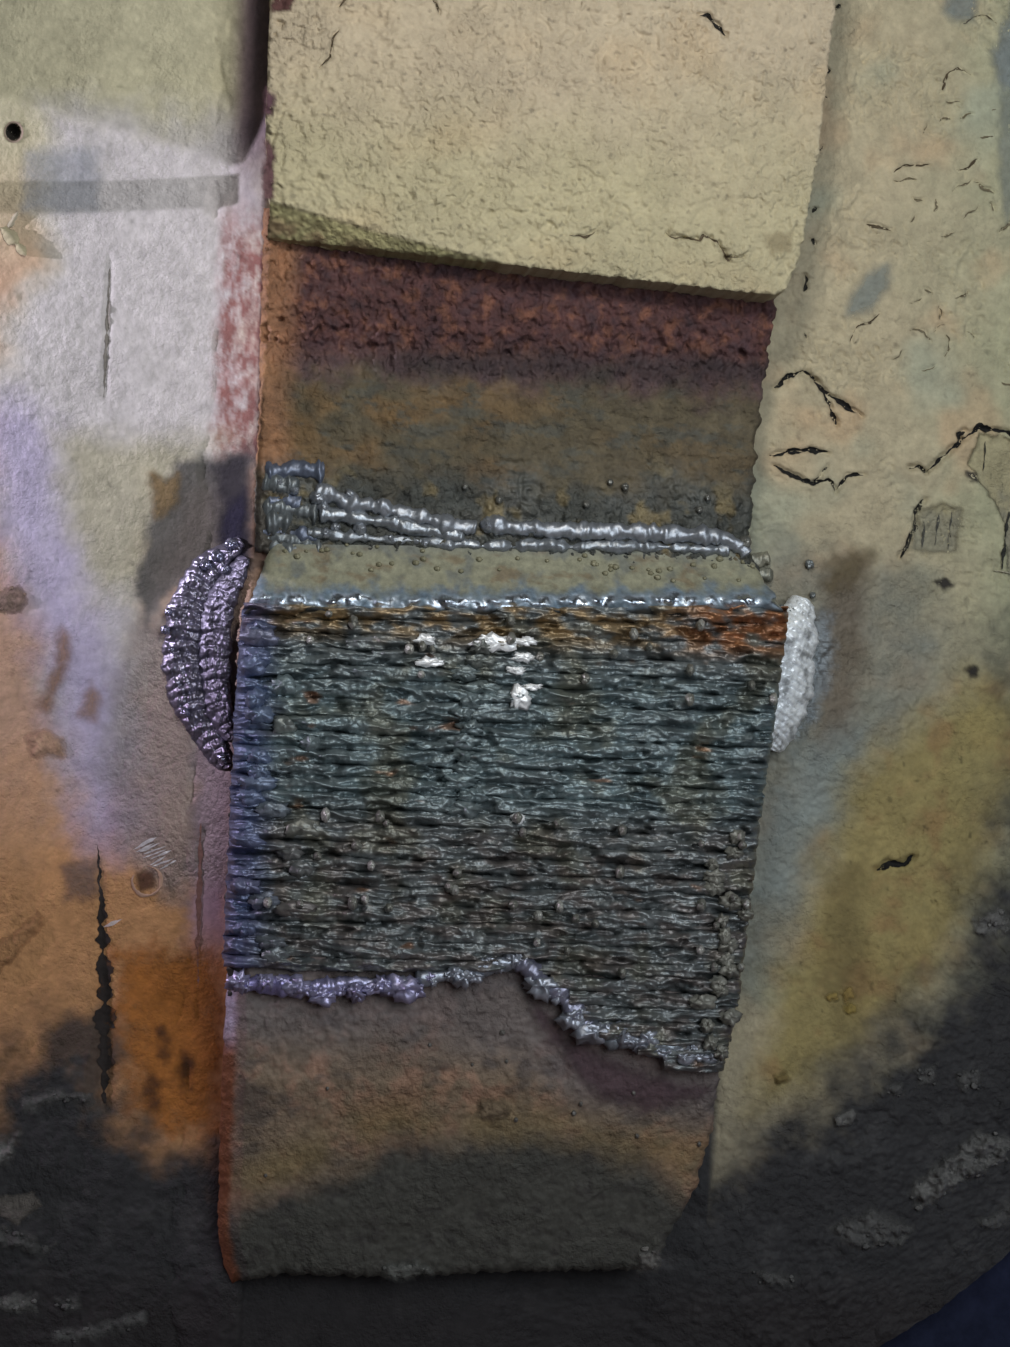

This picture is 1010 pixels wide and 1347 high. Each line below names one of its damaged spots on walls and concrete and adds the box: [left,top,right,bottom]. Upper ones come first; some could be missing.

crack [769,370,862,491]
crack [900,422,1010,558]